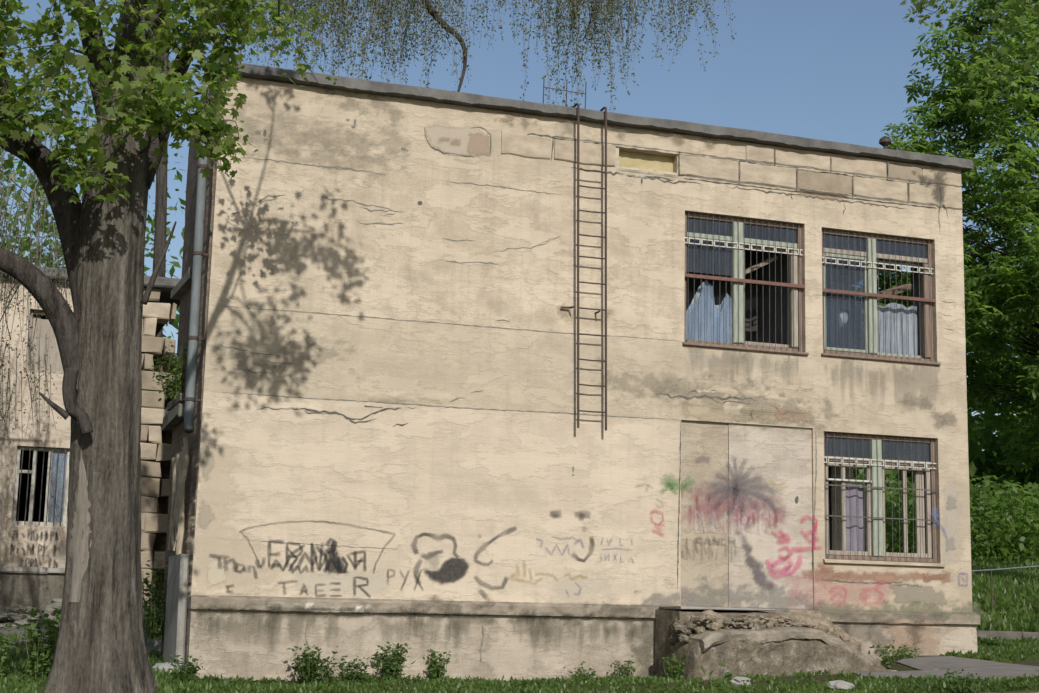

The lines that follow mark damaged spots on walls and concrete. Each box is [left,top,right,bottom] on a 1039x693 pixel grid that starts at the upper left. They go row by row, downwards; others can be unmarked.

spalling [424,125,492,157]
crack [243,157,380,174]
crack [322,196,403,225]
crack [729,186,904,215]
crack [441,236,560,265]
crack [221,346,758,590]
spalling [804,570,950,587]